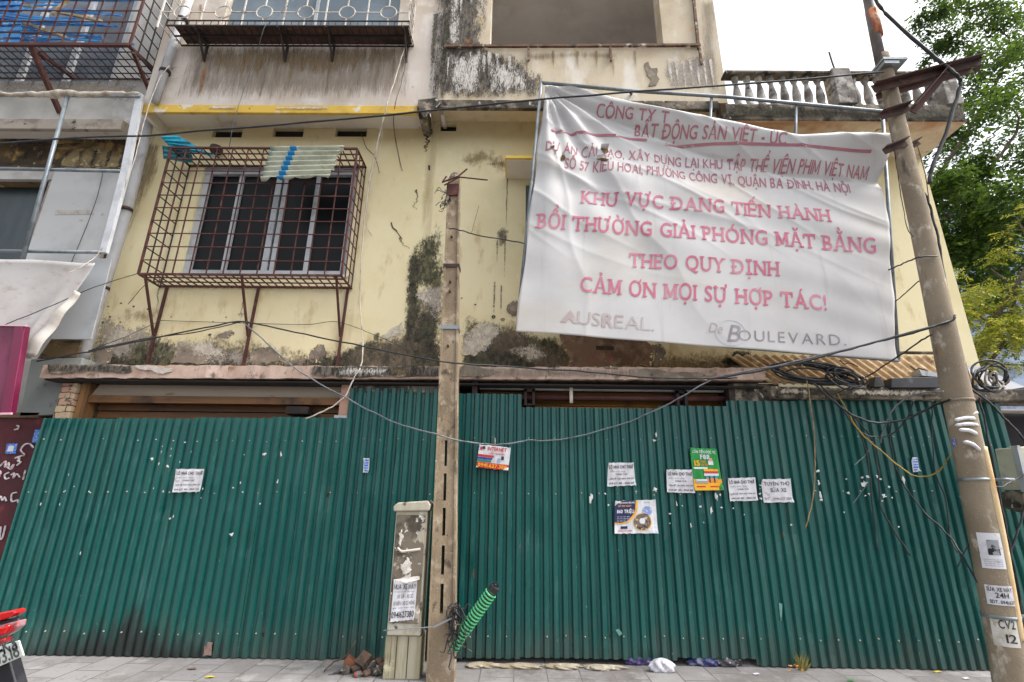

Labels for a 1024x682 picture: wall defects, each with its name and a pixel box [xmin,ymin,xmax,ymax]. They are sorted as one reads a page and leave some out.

water stain [180,47,405,96]
water stain [430,0,562,98]
peeling [644,62,659,87]
water stain [48,231,444,376]
peeling [460,300,518,379]